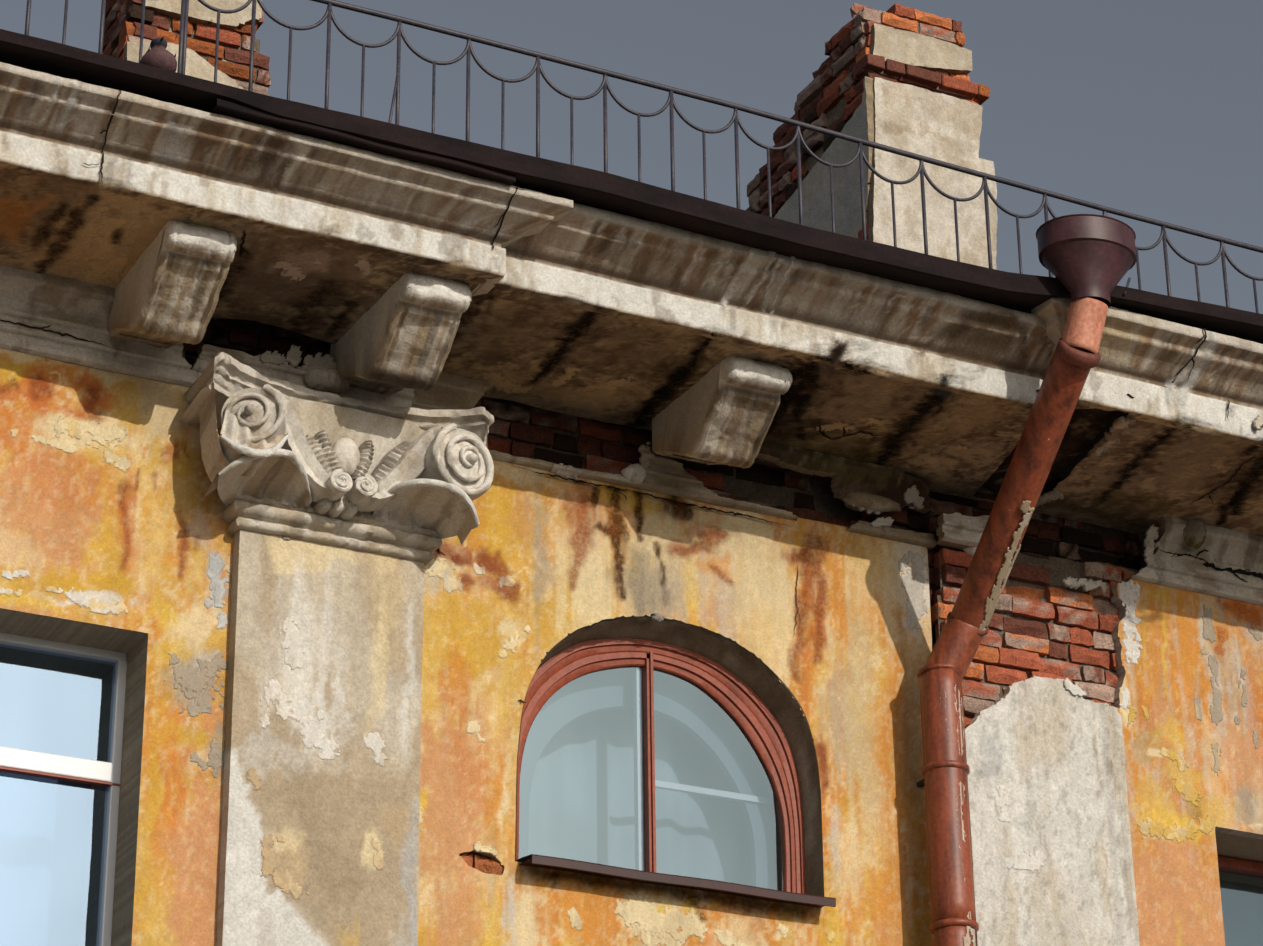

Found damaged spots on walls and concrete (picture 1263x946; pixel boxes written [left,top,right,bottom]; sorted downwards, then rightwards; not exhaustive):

crack [84,90,121,181]
crack [491,187,518,249]
water stain [454,288,495,340]
spalling [474,358,655,480]
water stain [630,333,715,426]
water stain [767,340,953,466]
crack [1169,328,1207,387]
water stain [592,486,665,599]
spalling [939,408,1160,756]
crack [1161,549,1263,582]
spalling [459,841,503,875]
peeling [615,893,750,946]